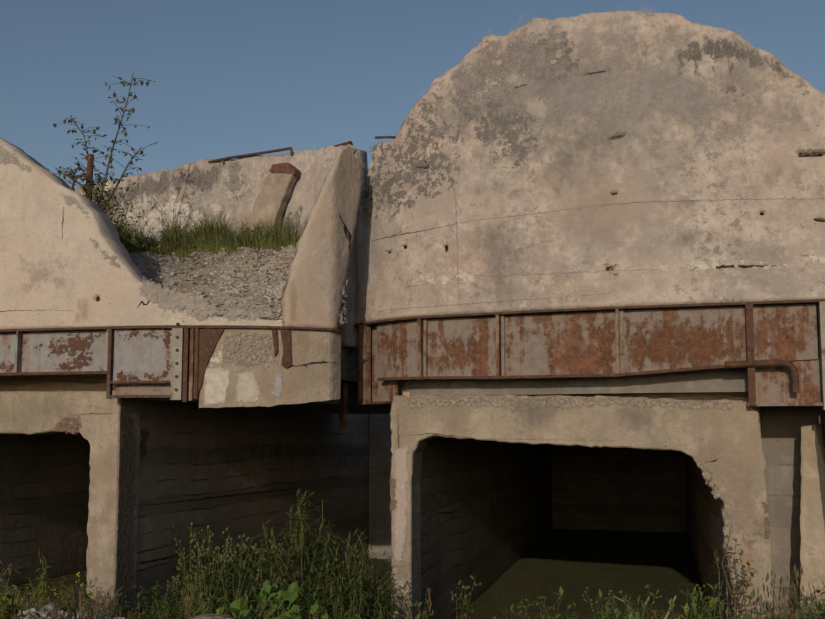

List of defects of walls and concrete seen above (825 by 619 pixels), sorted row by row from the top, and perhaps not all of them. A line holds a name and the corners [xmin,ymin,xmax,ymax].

rust [433,336,481,376]
rust [587,318,616,373]
rust [624,317,742,368]